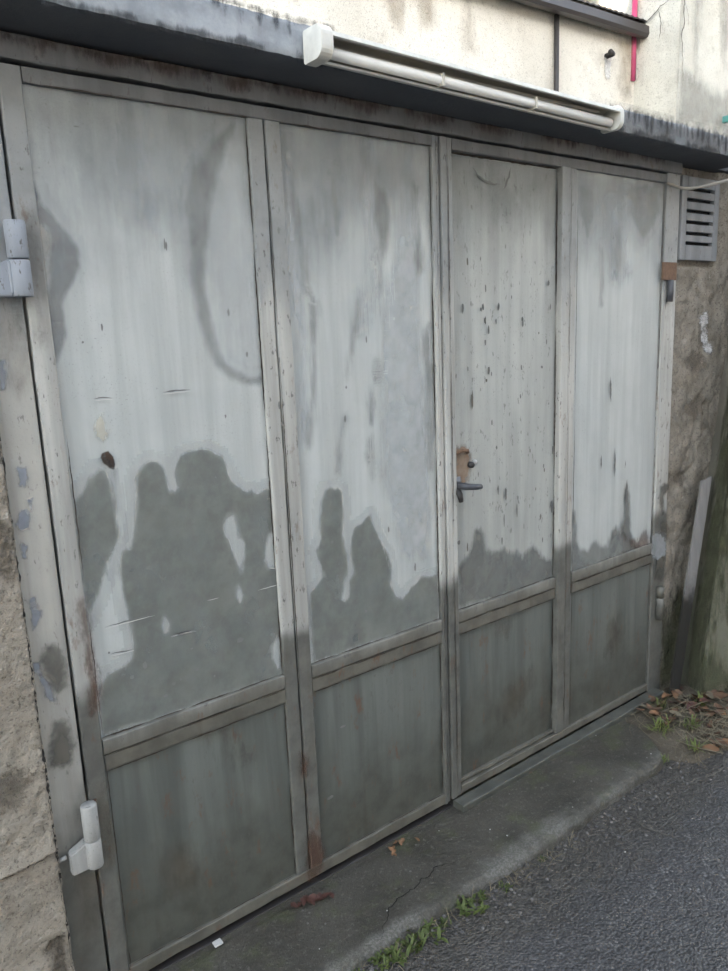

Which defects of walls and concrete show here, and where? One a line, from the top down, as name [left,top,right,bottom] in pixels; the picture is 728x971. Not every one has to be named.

crack [638,0,689,86]
damp [76,449,283,735]
damp [310,488,439,660]
rust [456,446,471,483]
damp [460,530,553,604]
damp [571,491,637,571]
damp [687,400,728,693]
crack [0,437,74,971]